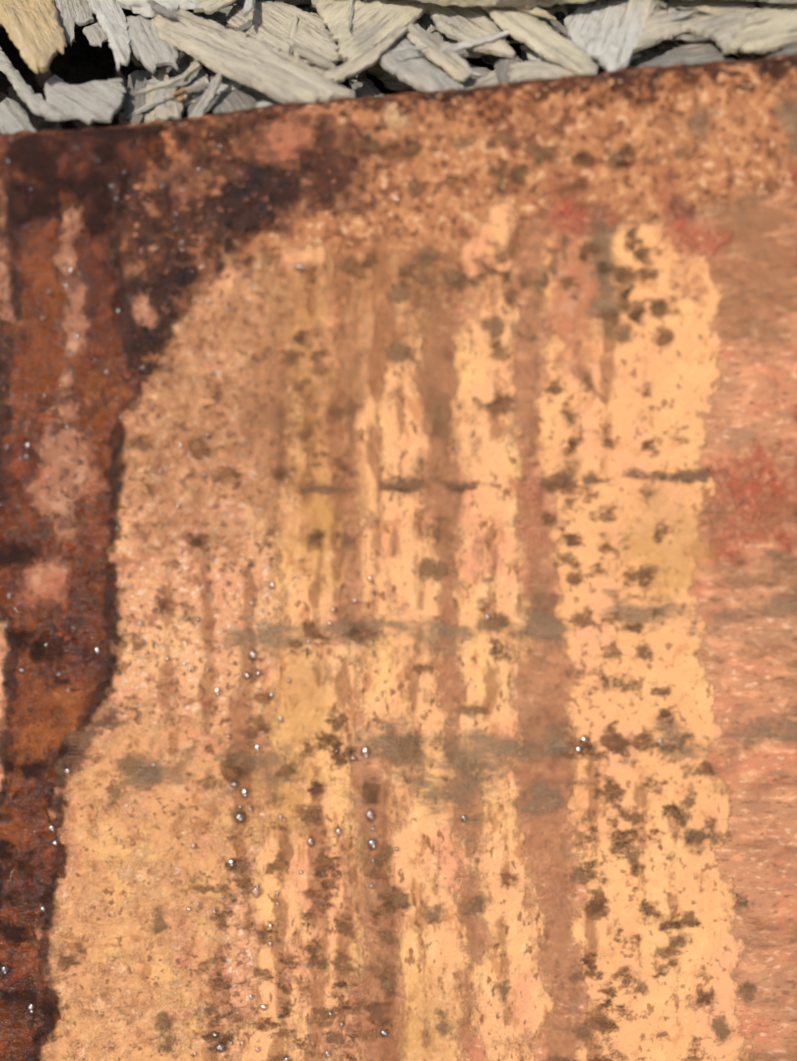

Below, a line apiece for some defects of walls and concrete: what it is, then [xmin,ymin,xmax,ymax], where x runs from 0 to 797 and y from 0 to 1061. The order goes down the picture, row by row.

corrosion [177,118,206,127]
corrosion [0,179,9,216]
corrosion [0,224,25,407]
damp [301,483,354,495]
damp [379,476,476,493]
damp [540,471,609,492]
damp [626,468,711,484]
damp [609,604,678,625]
damp [230,620,407,646]
damp [516,611,567,640]
damp [368,717,691,805]